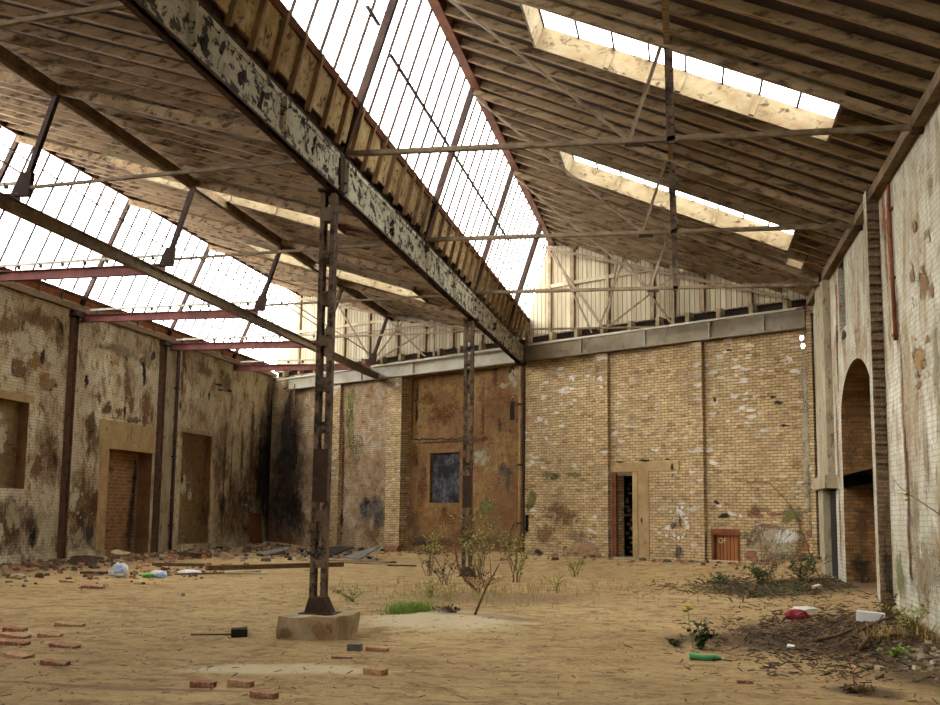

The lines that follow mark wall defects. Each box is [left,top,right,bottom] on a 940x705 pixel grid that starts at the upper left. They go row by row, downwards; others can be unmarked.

peeling [197,21,245,86]
peeling [910,262,934,308]
peeling [12,329,59,391]
peeling [86,351,156,429]
rust [882,196,911,584]
spalling [912,336,930,389]
damp [87,423,101,461]
damp [203,392,294,536]
damp [340,410,362,528]
damp [0,500,33,555]
damp [68,472,98,544]
peeling [658,502,690,558]